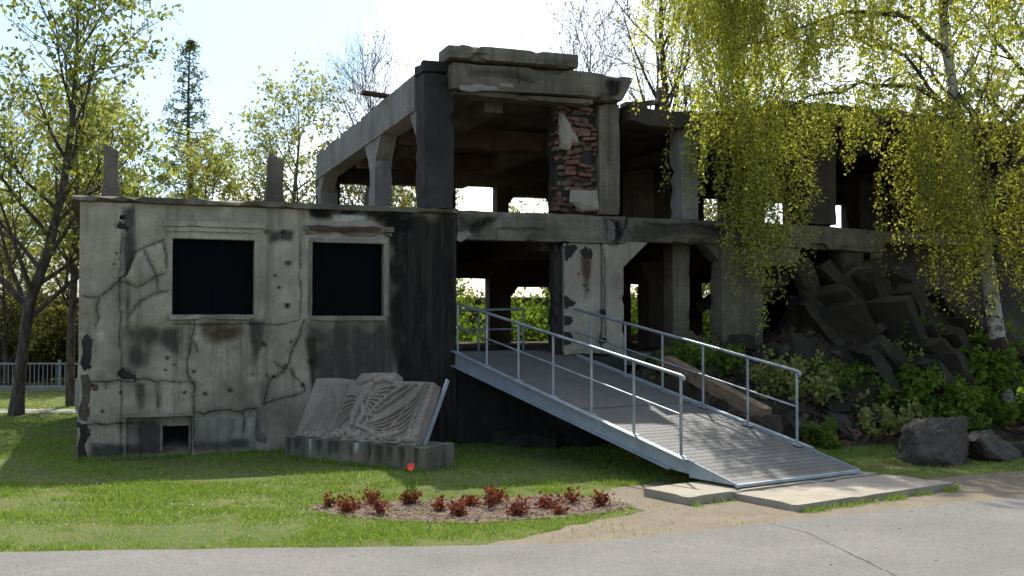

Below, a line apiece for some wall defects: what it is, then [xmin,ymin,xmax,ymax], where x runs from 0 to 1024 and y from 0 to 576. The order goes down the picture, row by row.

spalling [563,243,593,261]
corrosion [582,256,590,290]
water stain [130,328,178,365]
crack [82,232,305,452]
water stain [250,321,262,354]
water stain [309,325,392,380]
spalling [562,292,576,345]
spalling [75,334,104,459]